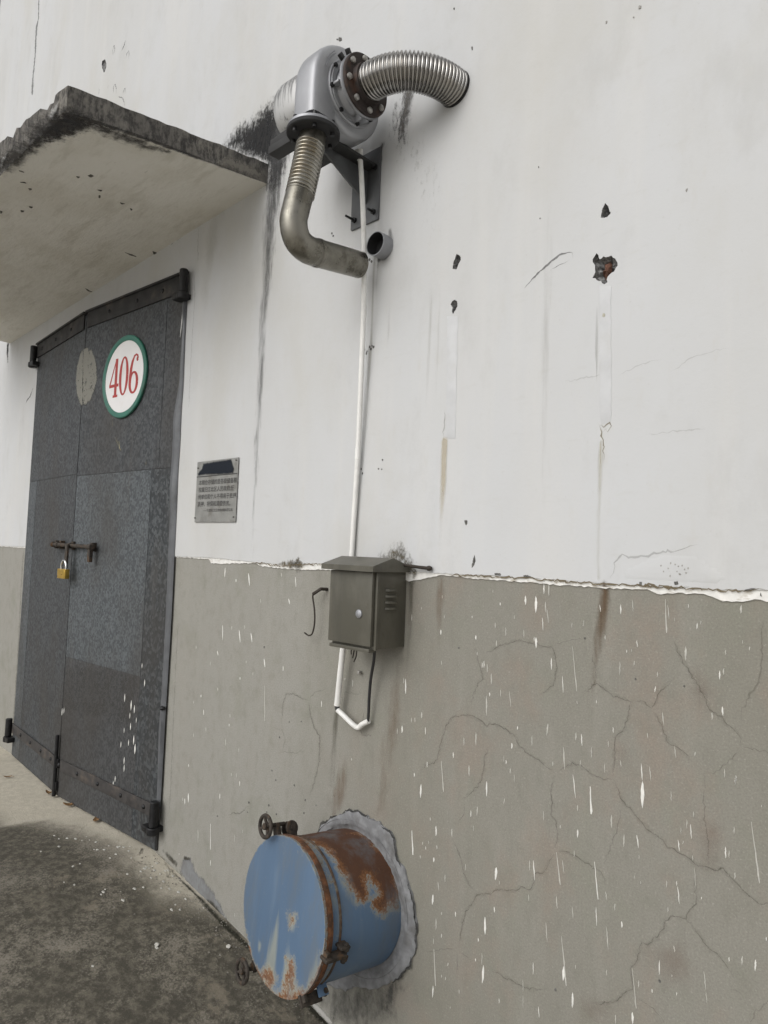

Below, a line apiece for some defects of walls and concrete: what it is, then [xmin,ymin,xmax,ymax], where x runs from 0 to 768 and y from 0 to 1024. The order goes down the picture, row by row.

damp [0,105,201,173]
damp [228,106,286,259]
flaking render [593,253,618,284]
corrosion [600,584,608,632]